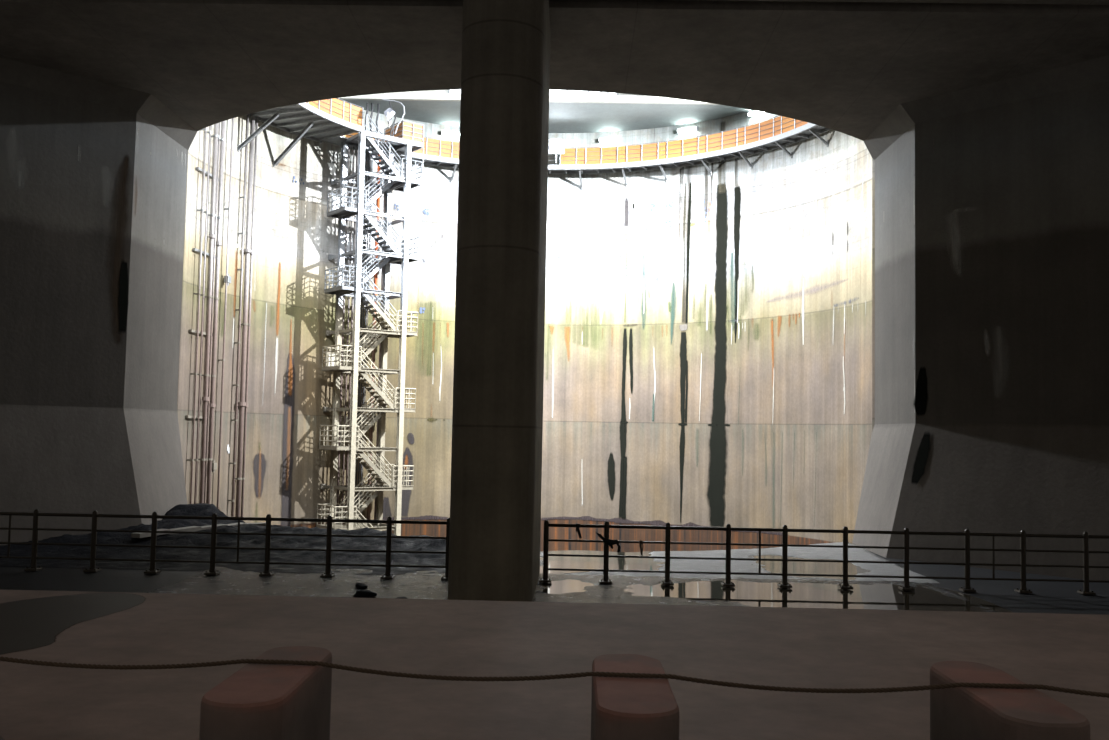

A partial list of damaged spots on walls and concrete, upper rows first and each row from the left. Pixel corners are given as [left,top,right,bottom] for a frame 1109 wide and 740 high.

rust [550,326,569,361]
damp [541,159,743,527]
rust [771,313,800,402]
damp [254,449,266,497]